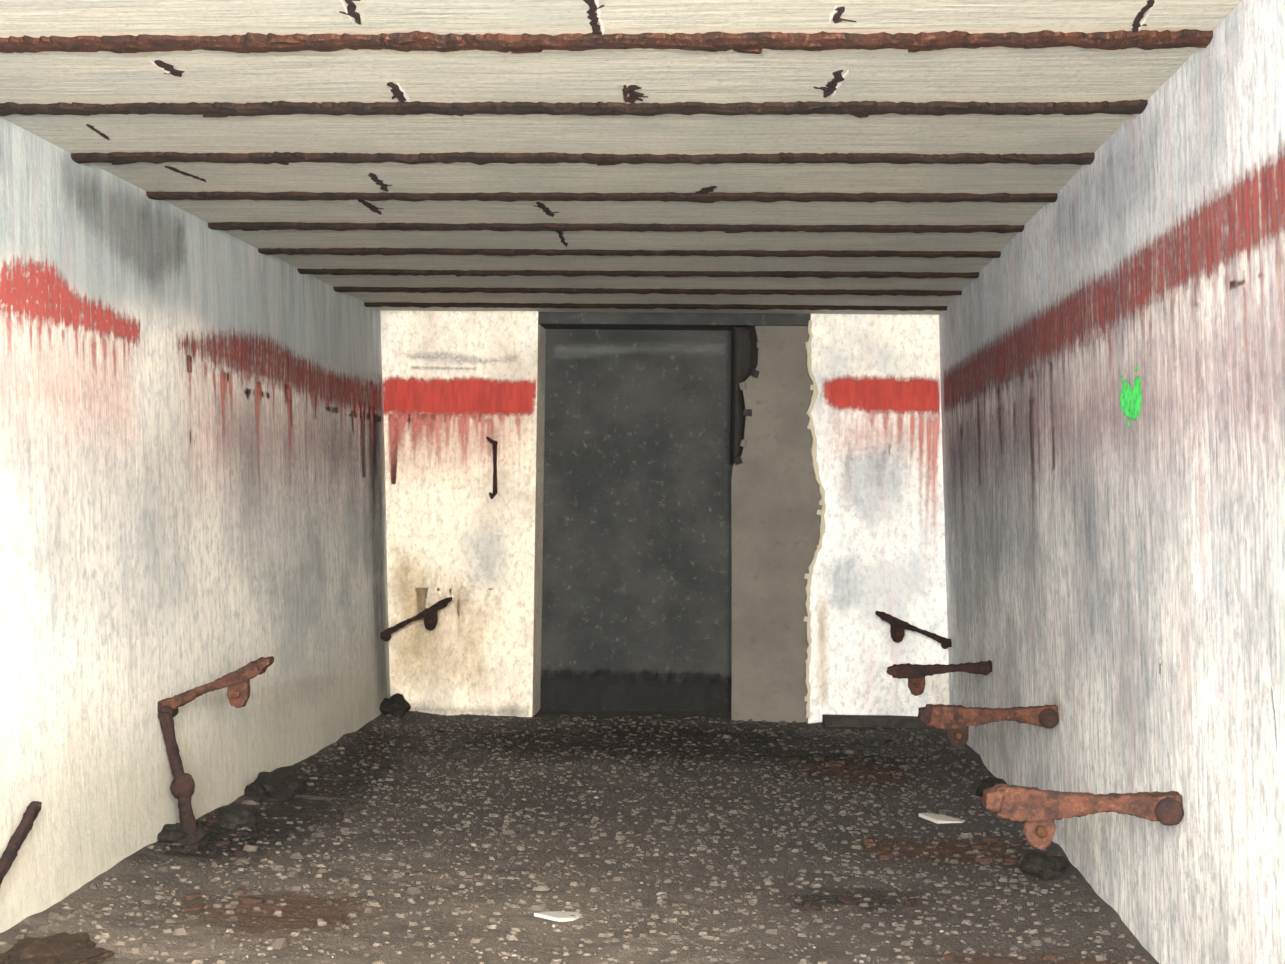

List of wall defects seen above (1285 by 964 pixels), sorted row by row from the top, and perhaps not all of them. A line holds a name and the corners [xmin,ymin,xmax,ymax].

crack [1132,0,1156,33]